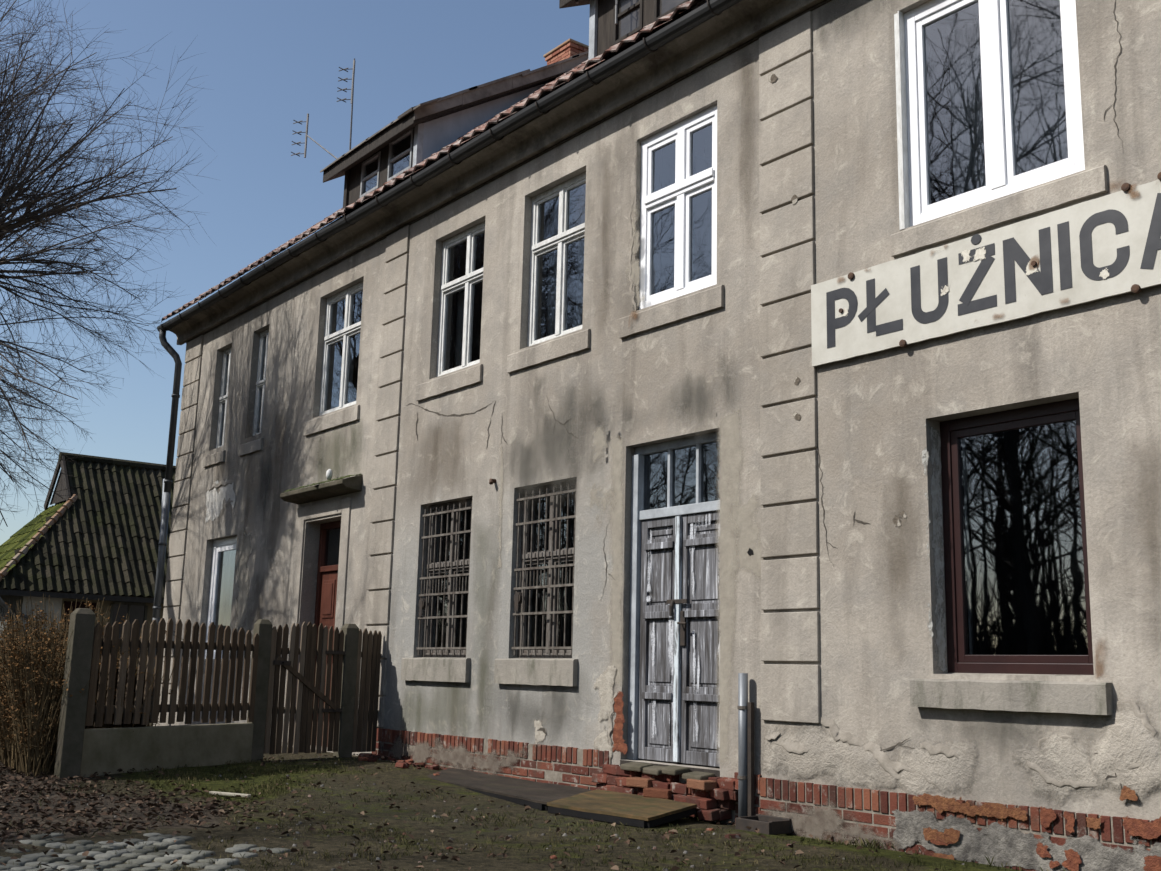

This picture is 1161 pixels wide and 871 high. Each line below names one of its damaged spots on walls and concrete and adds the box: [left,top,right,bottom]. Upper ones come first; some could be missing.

crack [1104,0,1123,147]
crack [408,401,507,449]
flaking render [205,479,236,523]
flaking render [593,665,627,758]
flaking render [534,720,546,744]
flaking render [1120,786,1138,801]
flaking render [923,827,960,860]
flaking render [913,793,1102,834]
flaking render [1036,841,1082,871]
flaking render [1122,816,1161,839]
flaking render [1143,855,1161,871]